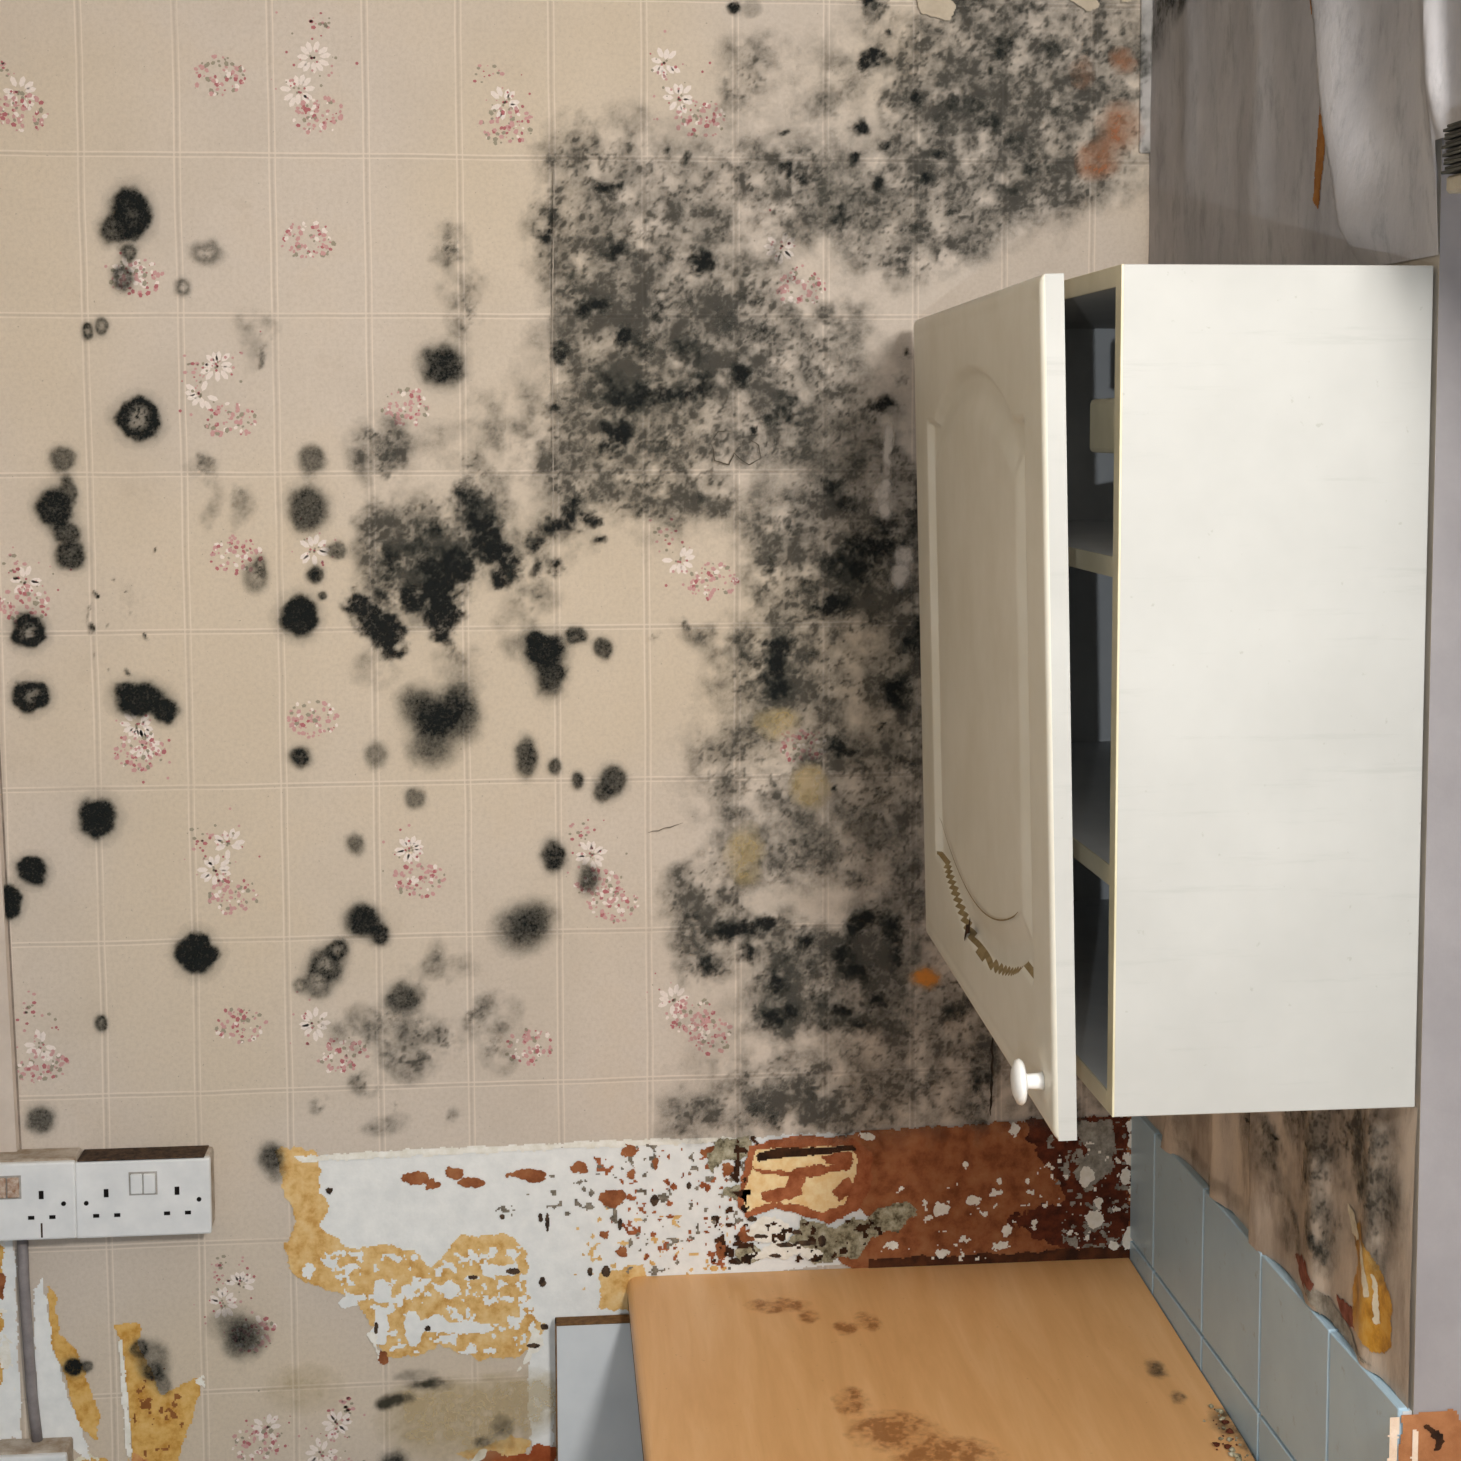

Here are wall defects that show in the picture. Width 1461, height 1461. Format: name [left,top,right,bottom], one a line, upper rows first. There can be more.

damp [101,187,153,291]
damp [113,394,161,442]
damp [35,447,85,569]
damp [11,612,47,648]
damp [279,0,1184,1265]
damp [12,681,50,713]
damp [114,670,180,724]
damp [78,798,117,840]
damp [4,856,47,920]
damp [174,932,221,974]
flaking render [302,1114,1133,1461]
flaking render [1387,1409,1461,1461]